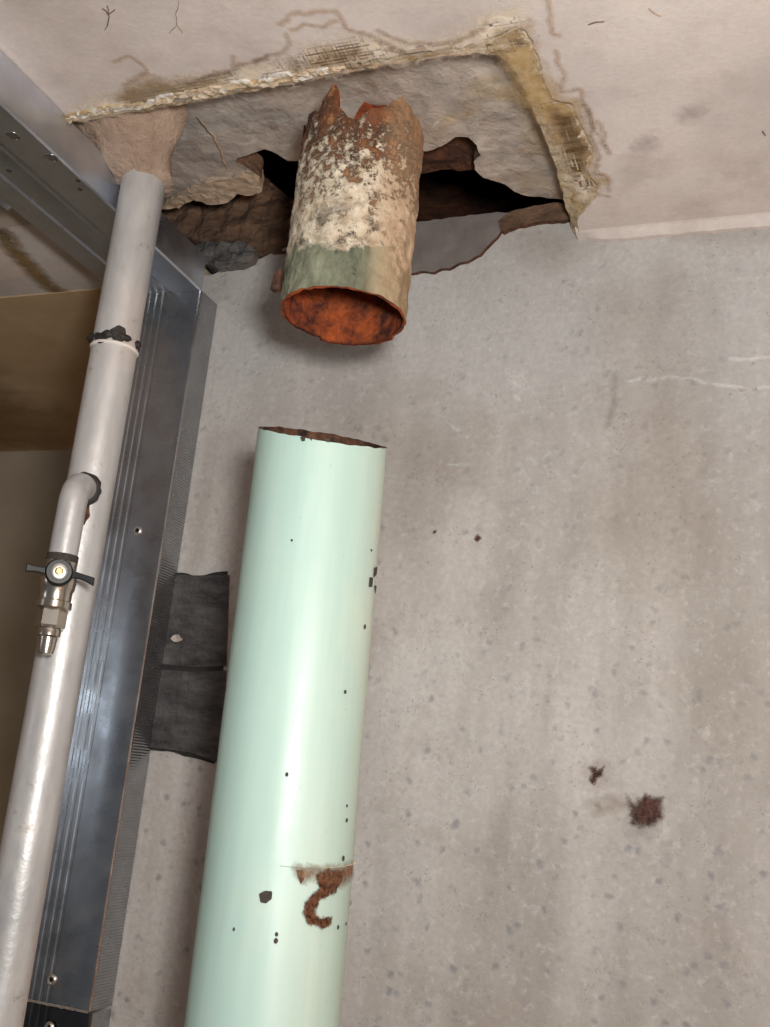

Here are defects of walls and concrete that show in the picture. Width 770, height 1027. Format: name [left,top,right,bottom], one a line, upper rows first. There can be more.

spalling [72,27,598,275]
leakage [66,8,607,199]
corrosion [629,795,662,826]